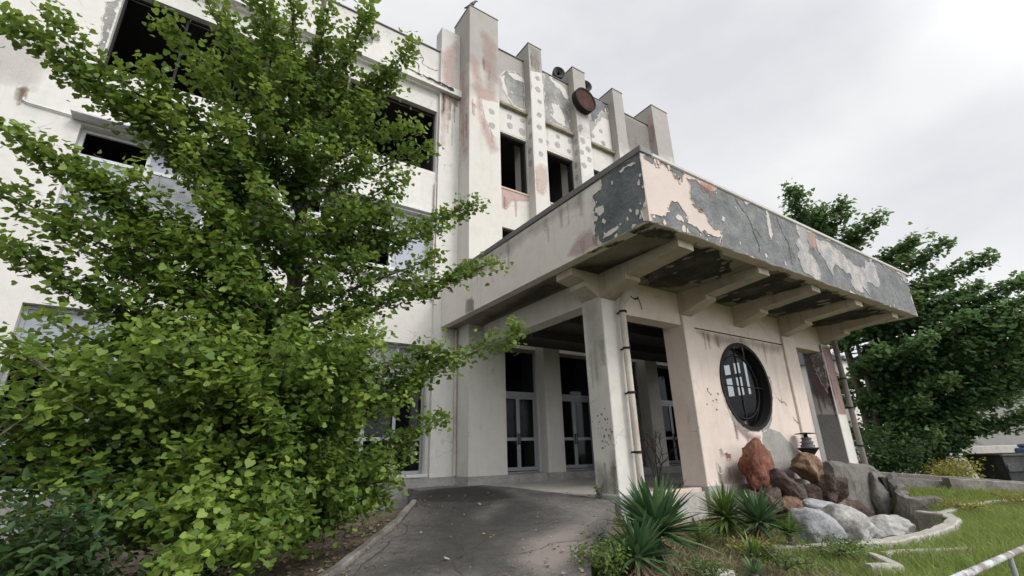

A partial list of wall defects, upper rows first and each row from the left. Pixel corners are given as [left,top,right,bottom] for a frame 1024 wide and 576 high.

water stain [502,165,547,211]
peeling [482,71,917,327]